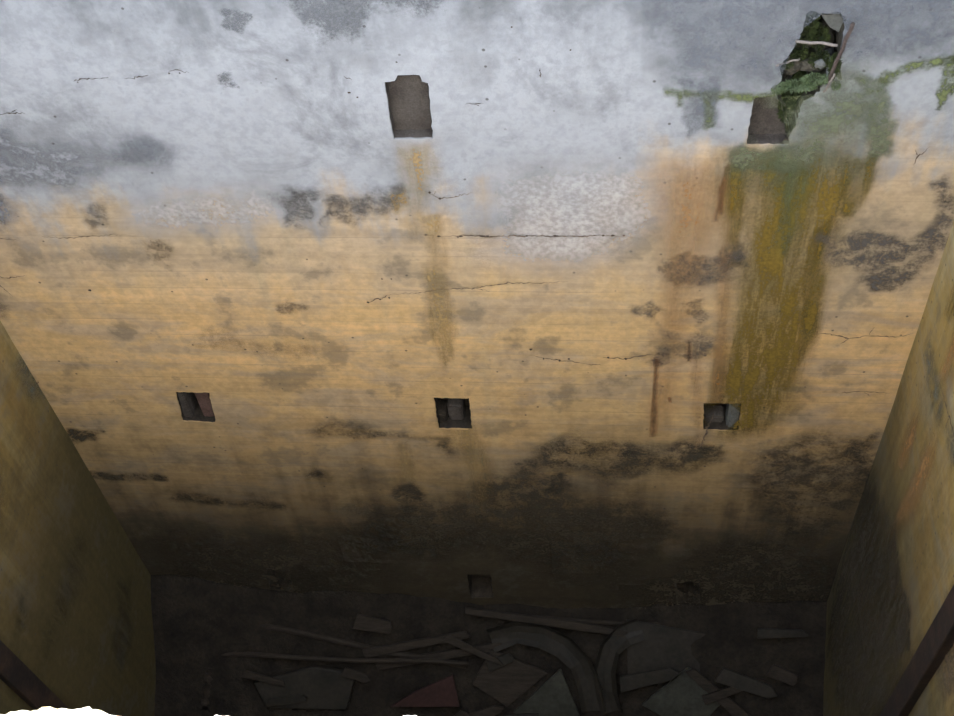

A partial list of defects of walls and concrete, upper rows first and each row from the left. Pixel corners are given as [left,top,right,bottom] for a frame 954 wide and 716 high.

spalling [770,11,855,138]
damp [283,186,400,222]
crack [421,232,638,240]
damp [817,179,954,291]
damp [659,249,745,285]
crack [367,278,568,303]
damp [159,438,720,595]